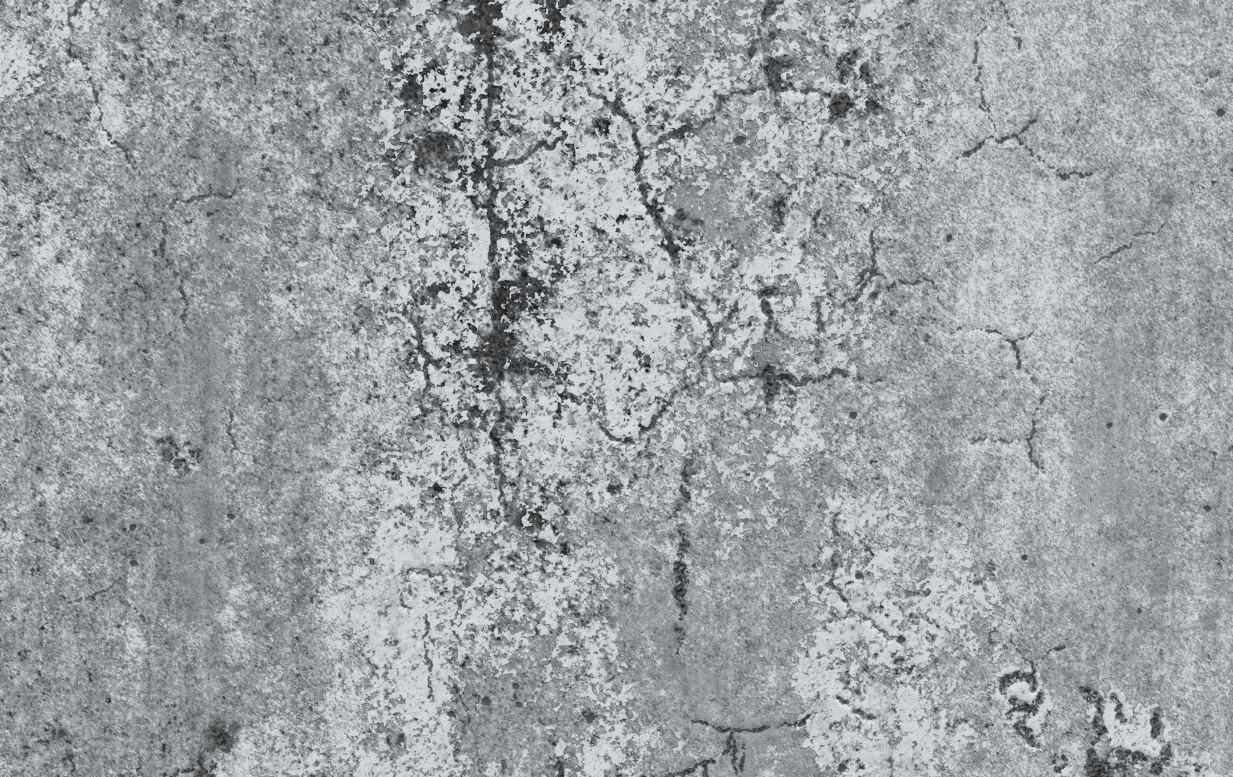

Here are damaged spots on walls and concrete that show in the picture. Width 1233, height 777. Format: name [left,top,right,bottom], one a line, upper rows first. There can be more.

crack [951,0,1092,181]
crack [587,0,1047,474]
crack [398,0,564,777]
crack [170,761,208,777]
crack [641,714,810,777]
crack [836,696,864,718]